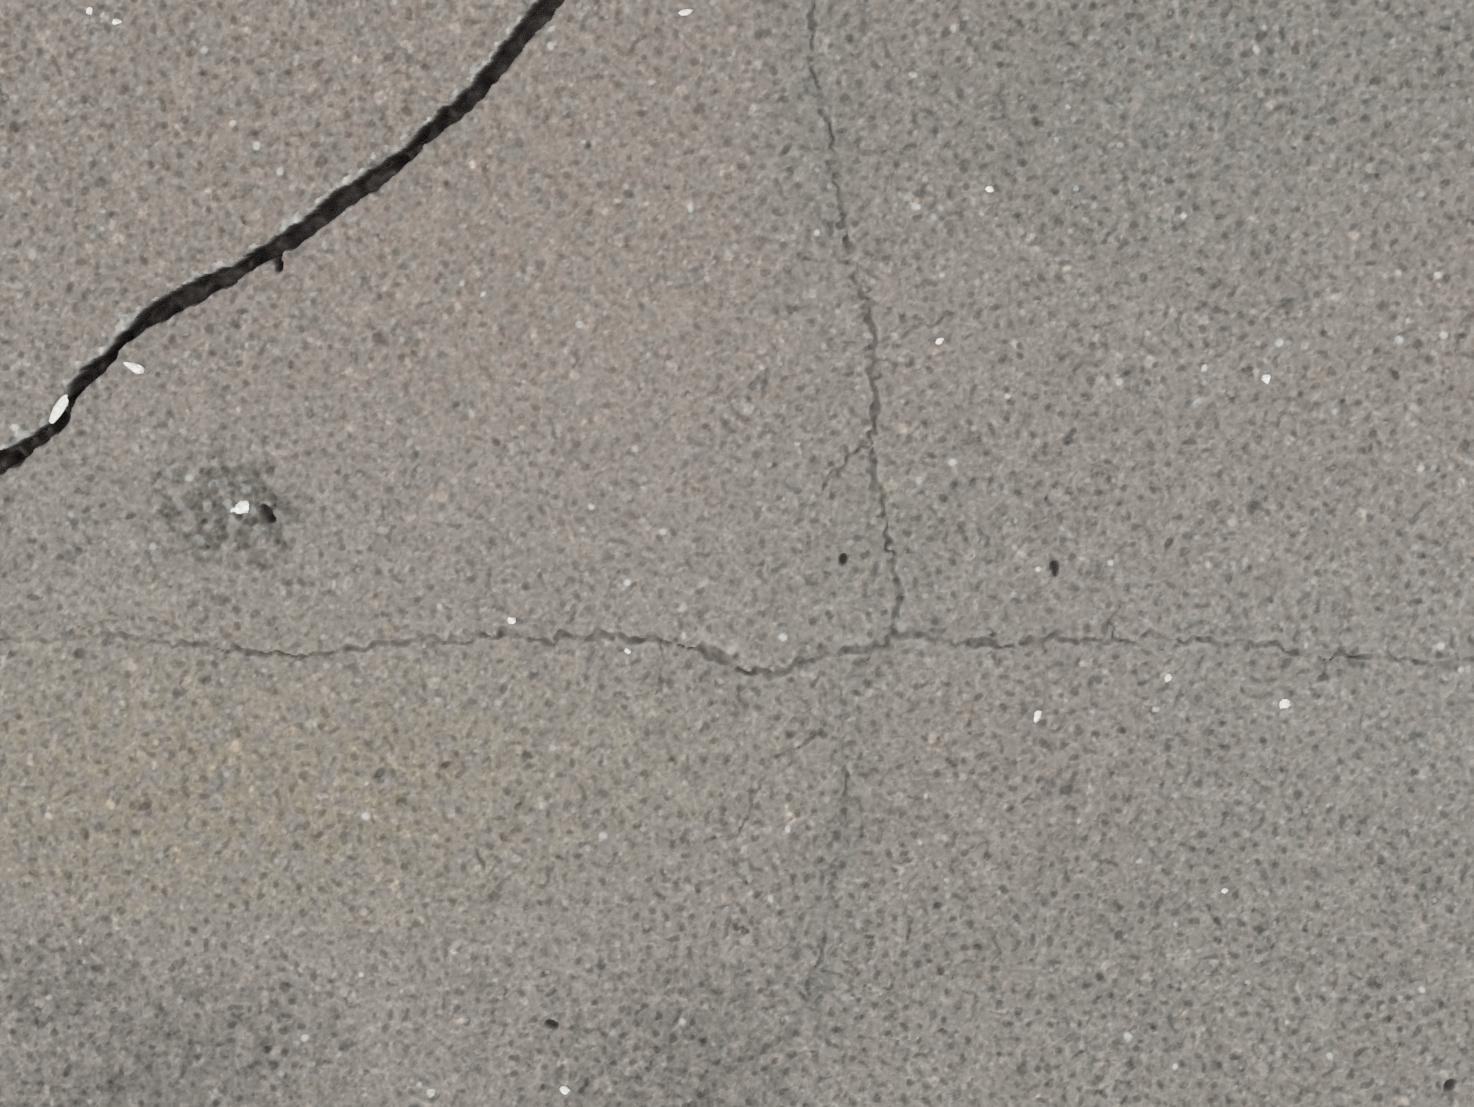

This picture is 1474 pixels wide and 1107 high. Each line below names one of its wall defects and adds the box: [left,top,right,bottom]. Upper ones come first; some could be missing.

crack [0,617,123,644]
crack [0,0,565,475]
crack [93,0,1474,922]
crack [792,926,828,1015]